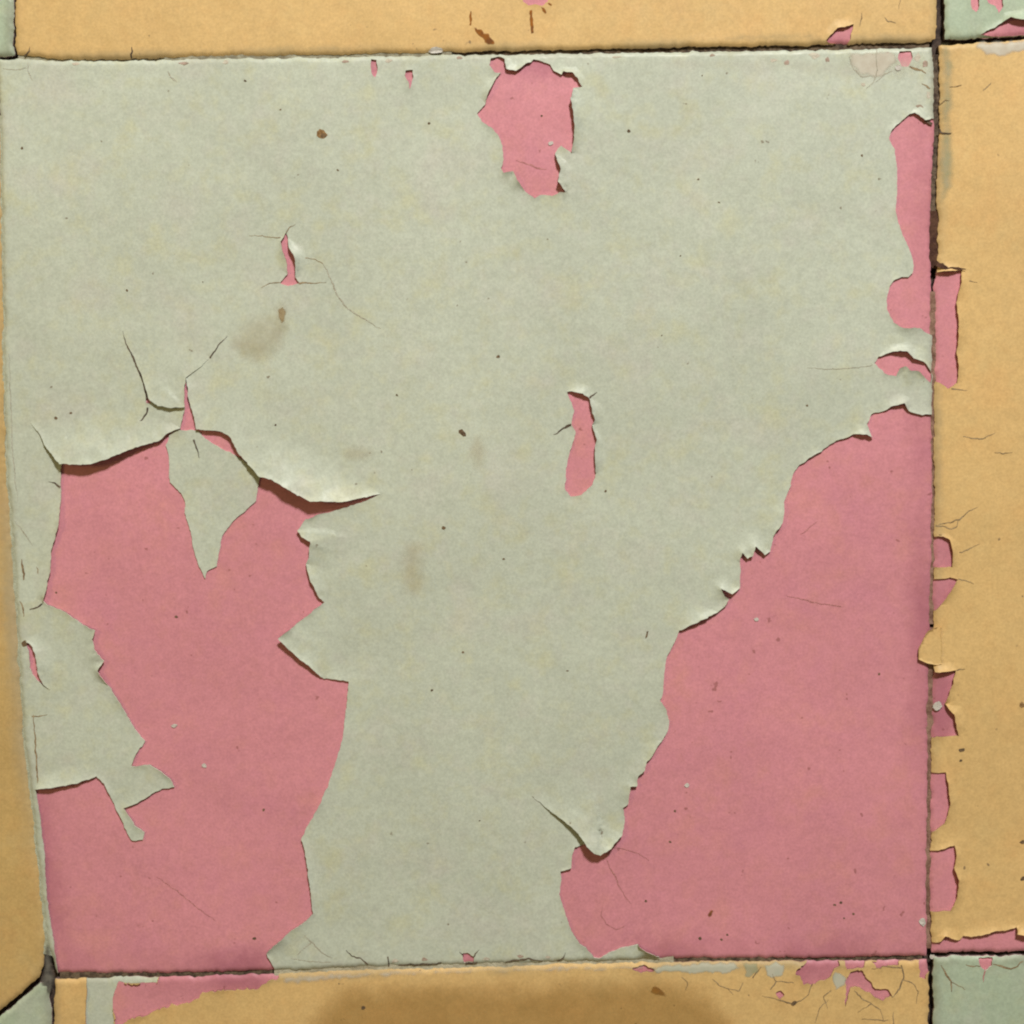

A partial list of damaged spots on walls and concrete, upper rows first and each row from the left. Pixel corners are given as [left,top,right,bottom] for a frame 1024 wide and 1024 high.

peeling [476,56,588,198]
crack [261,257,381,329]
crack [123,334,149,421]
peeling [534,92,1024,1004]
peeling [26,333,380,1024]
crack [715,965,919,1024]